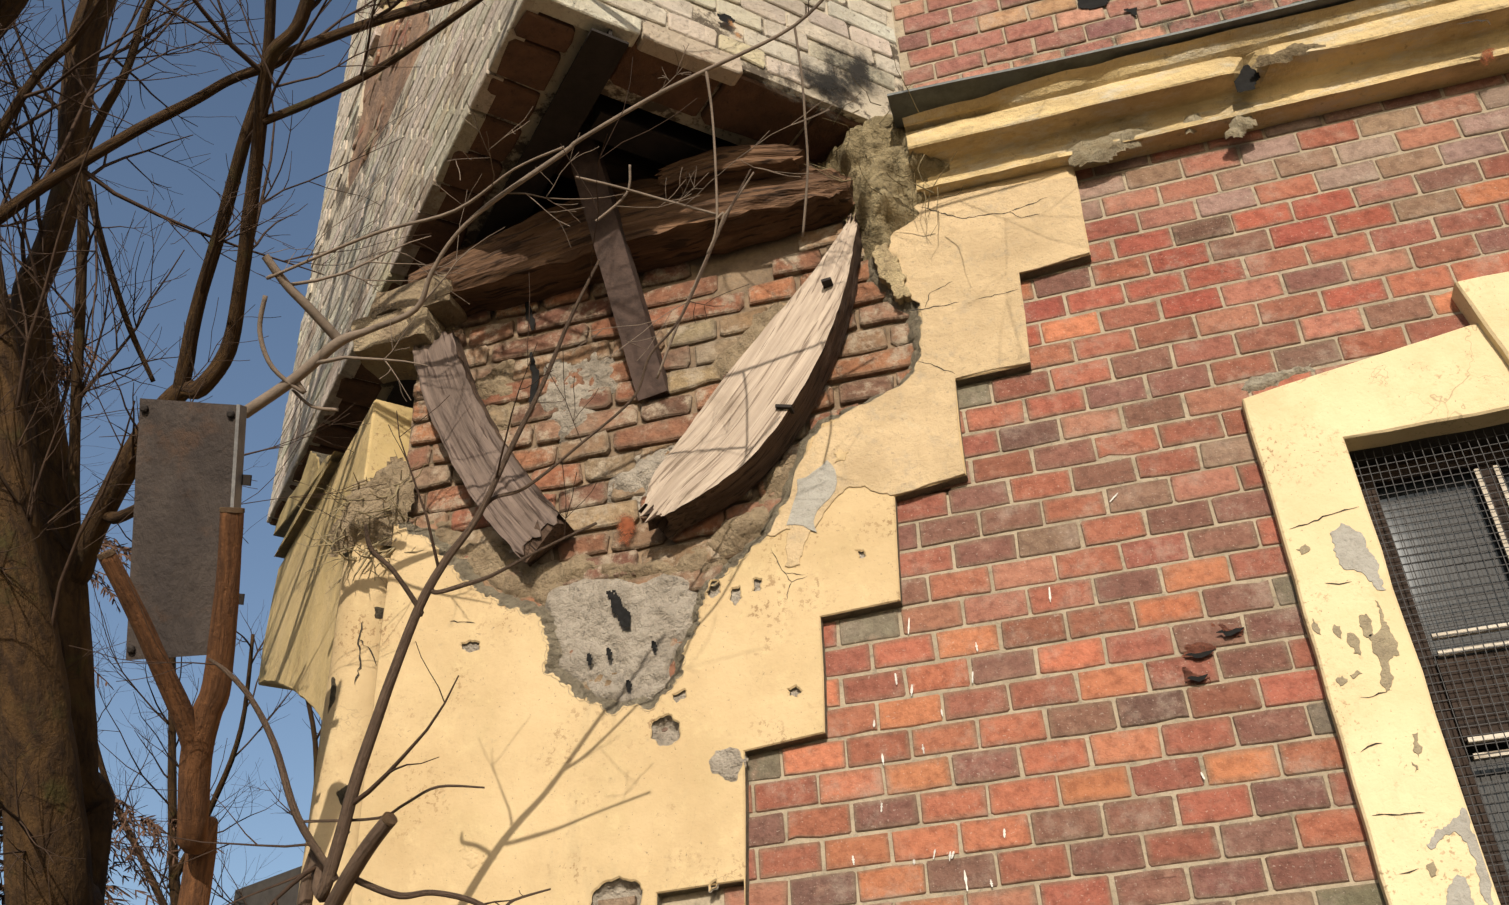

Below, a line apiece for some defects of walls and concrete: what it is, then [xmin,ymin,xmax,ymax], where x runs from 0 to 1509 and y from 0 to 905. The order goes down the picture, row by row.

spalling [1077,0,1138,15]
crack [922,198,1043,219]
crack [898,282,1017,312]
flaking render [396,128,1148,746]
peeling [1311,523,1399,692]
spalling [1182,623,1244,684]
spalling [709,747,748,782]
peeling [1426,807,1494,905]
spalling [592,878,642,905]